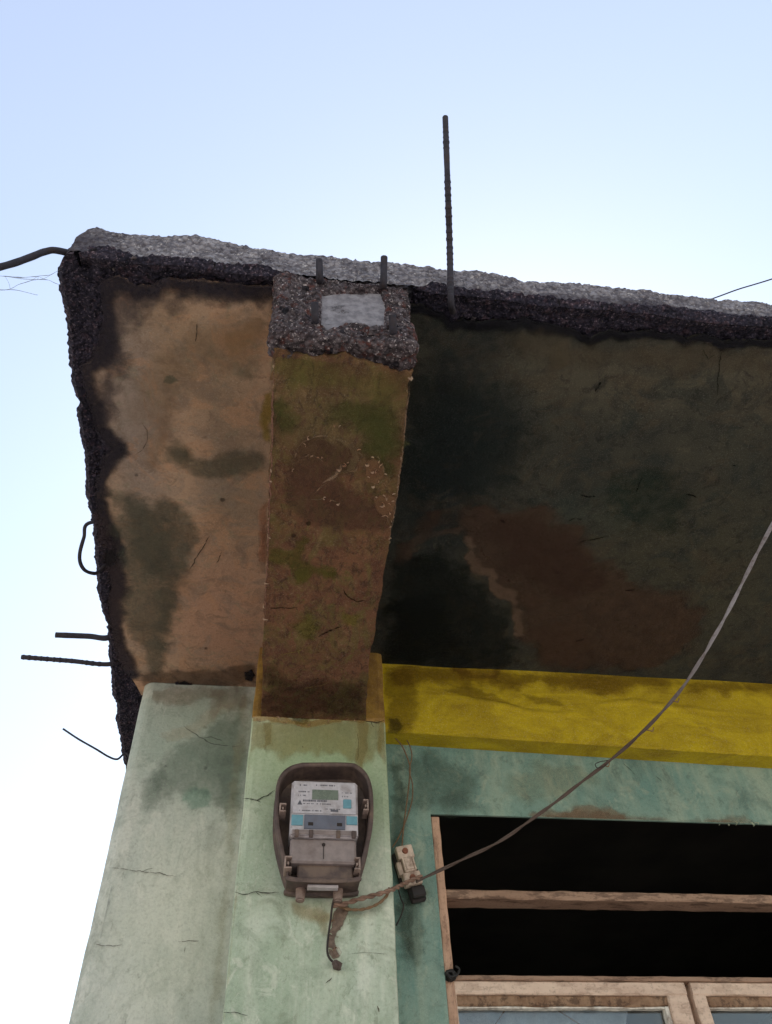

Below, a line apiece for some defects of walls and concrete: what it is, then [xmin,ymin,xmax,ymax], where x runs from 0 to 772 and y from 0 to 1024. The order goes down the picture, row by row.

damp [79,274,273,679]
spalling [0,115,772,768]
damp [385,506,701,670]